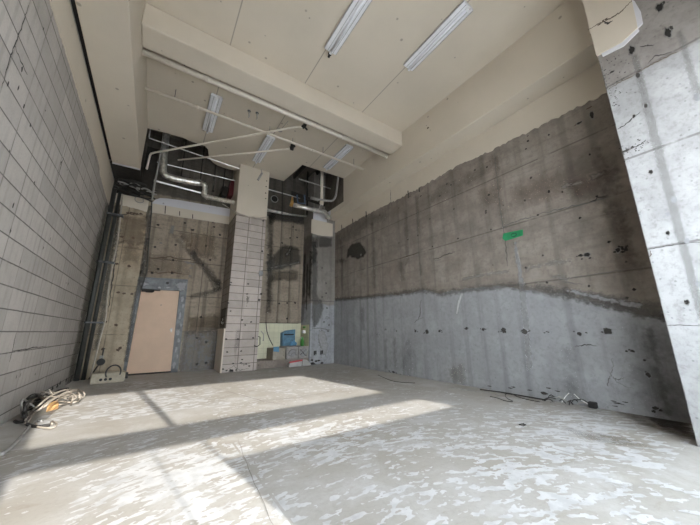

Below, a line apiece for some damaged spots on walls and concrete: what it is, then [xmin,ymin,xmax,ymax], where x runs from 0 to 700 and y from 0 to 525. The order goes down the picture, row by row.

crack [588,0,632,30]
crack [2,5,29,84]
water stain [347,242,366,259]